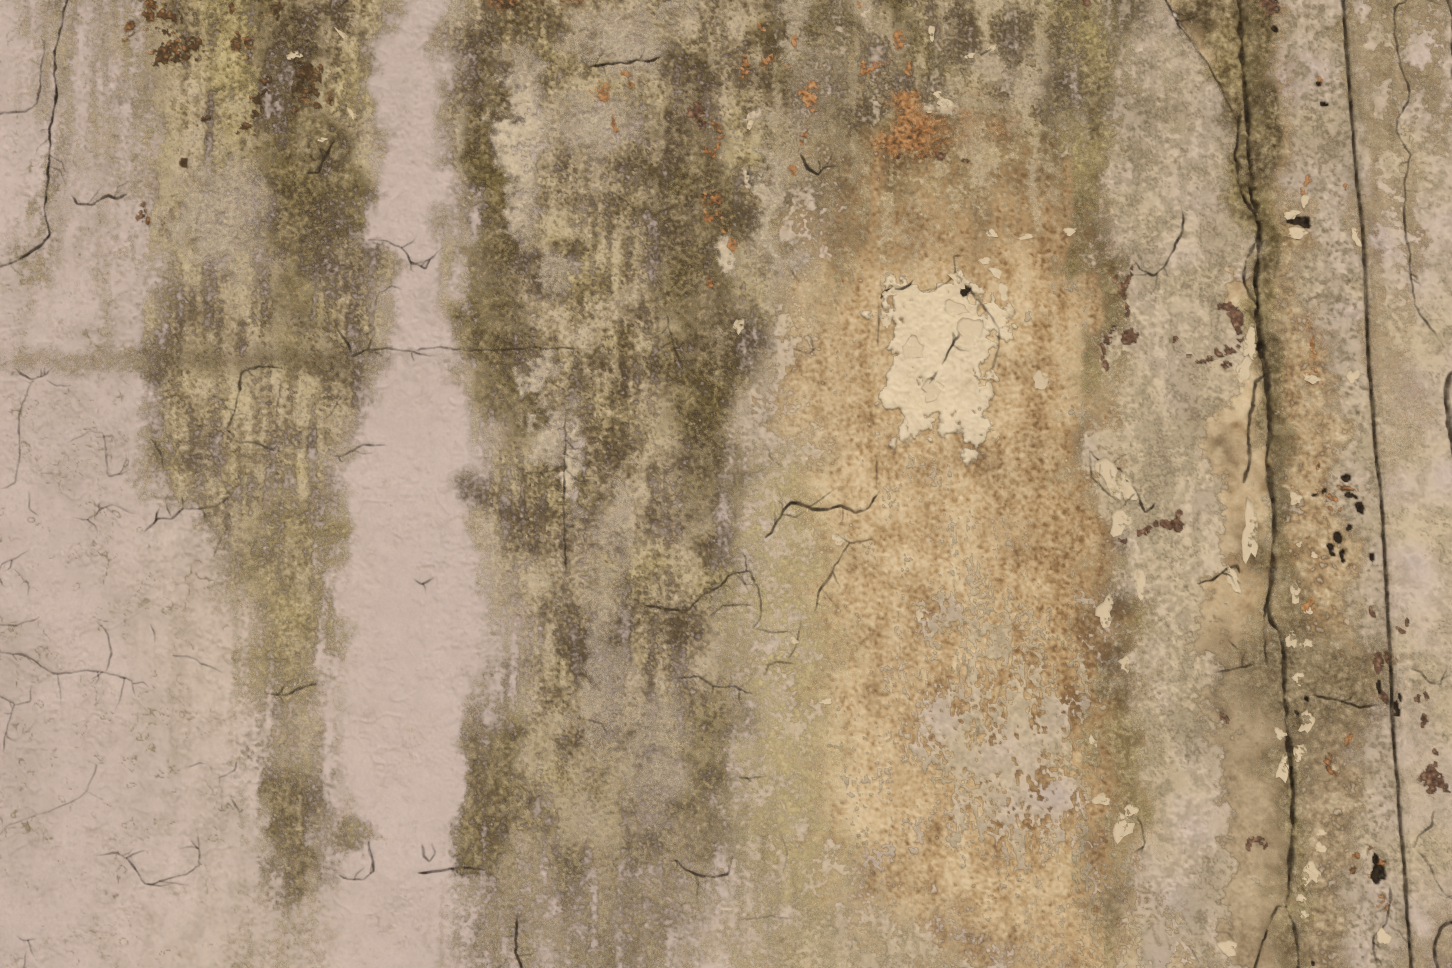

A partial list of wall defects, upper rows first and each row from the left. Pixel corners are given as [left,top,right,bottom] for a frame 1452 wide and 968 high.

crack [9,0,124,264]
rust [122,0,205,66]
rust [289,58,334,113]
peeling [483,53,625,244]
rust [860,30,968,174]
peeling [714,236,736,273]
leakage [4,0,402,903]
peeling [516,347,584,516]
crack [766,496,877,537]
leakage [429,0,1388,968]
peeling [742,0,1452,968]
crack [1201,0,1452,968]